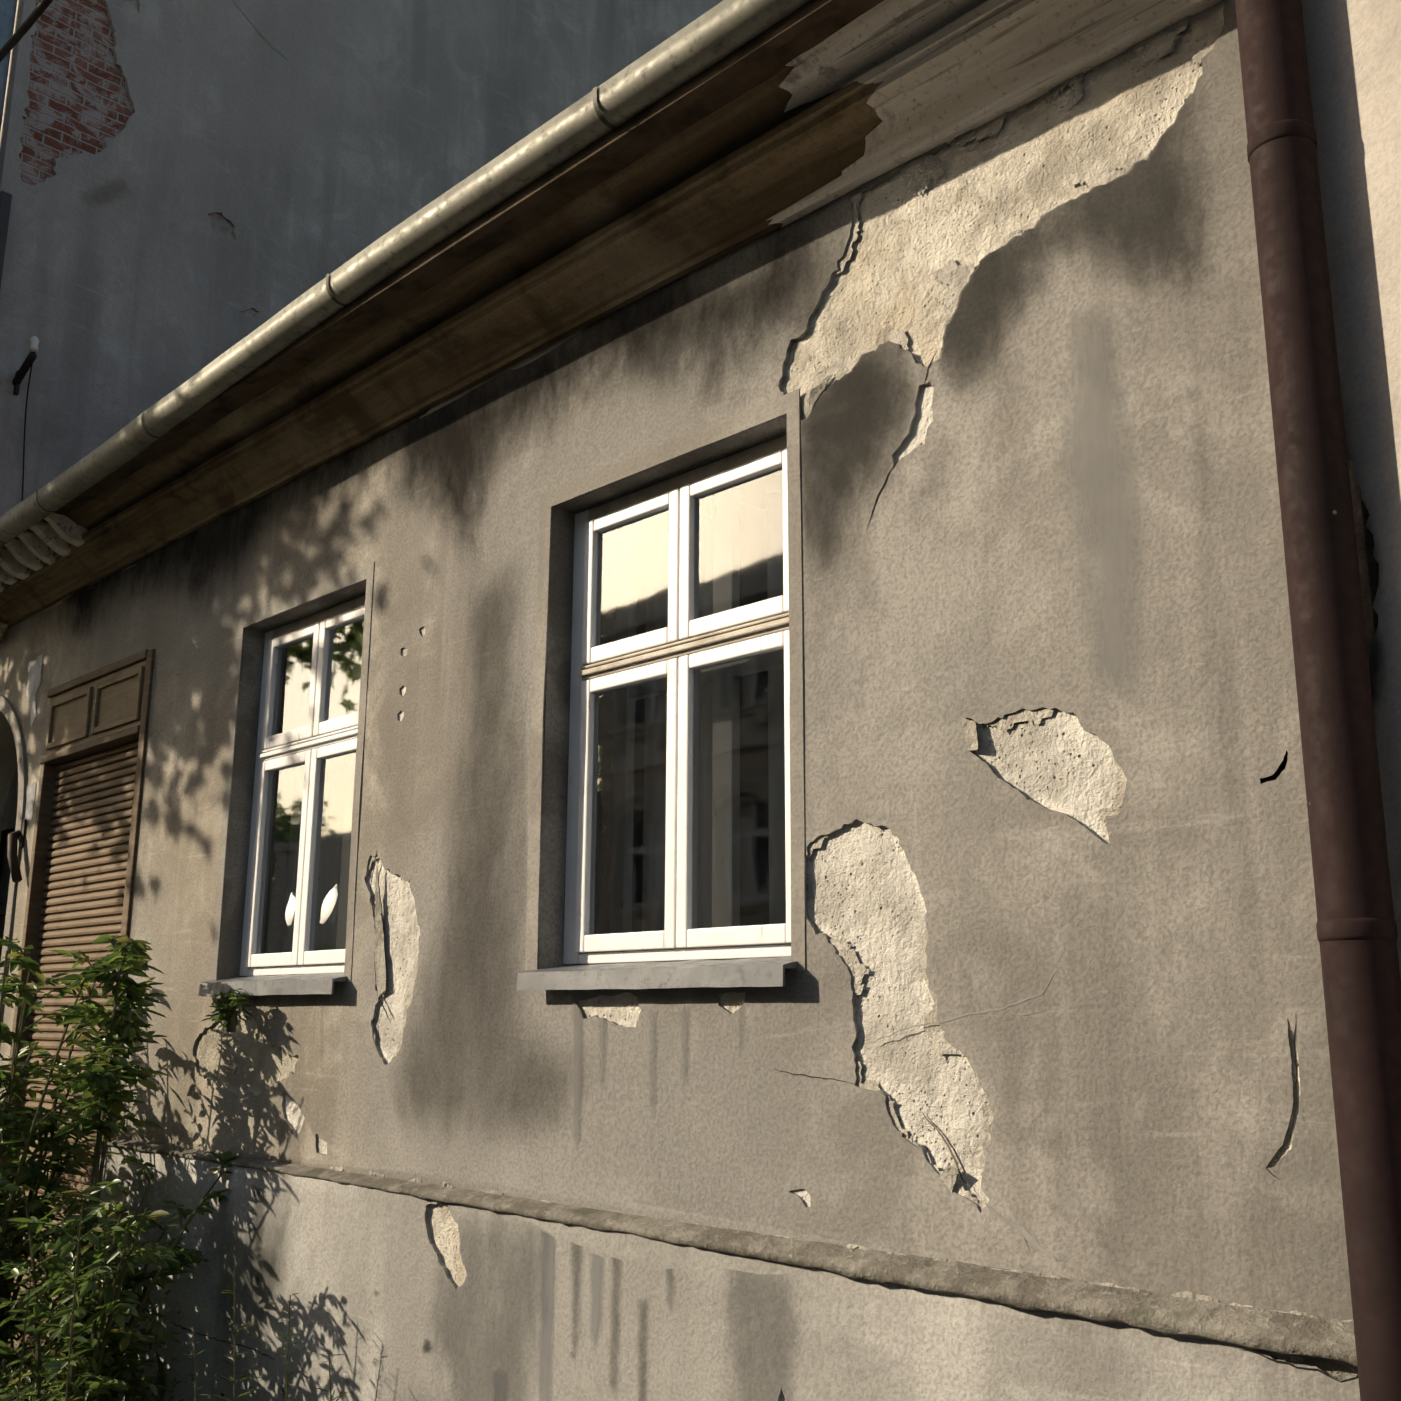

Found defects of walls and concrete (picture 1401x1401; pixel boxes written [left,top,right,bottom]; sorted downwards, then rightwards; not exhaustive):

flaking render [18,0,141,185]
flaking render [765,0,1224,469]
flaking render [961,707,1127,844]
flaking render [365,854,420,1065]
flaking render [576,992,641,1028]
flaking render [715,992,746,1014]
flaking render [805,819,994,1213]
crack [1266,1013,1298,1179]
spalling [424,1181,467,1290]
damp [541,1233,553,1401]
damp [593,1254,601,1334]
flaking render [1171,1291,1252,1307]